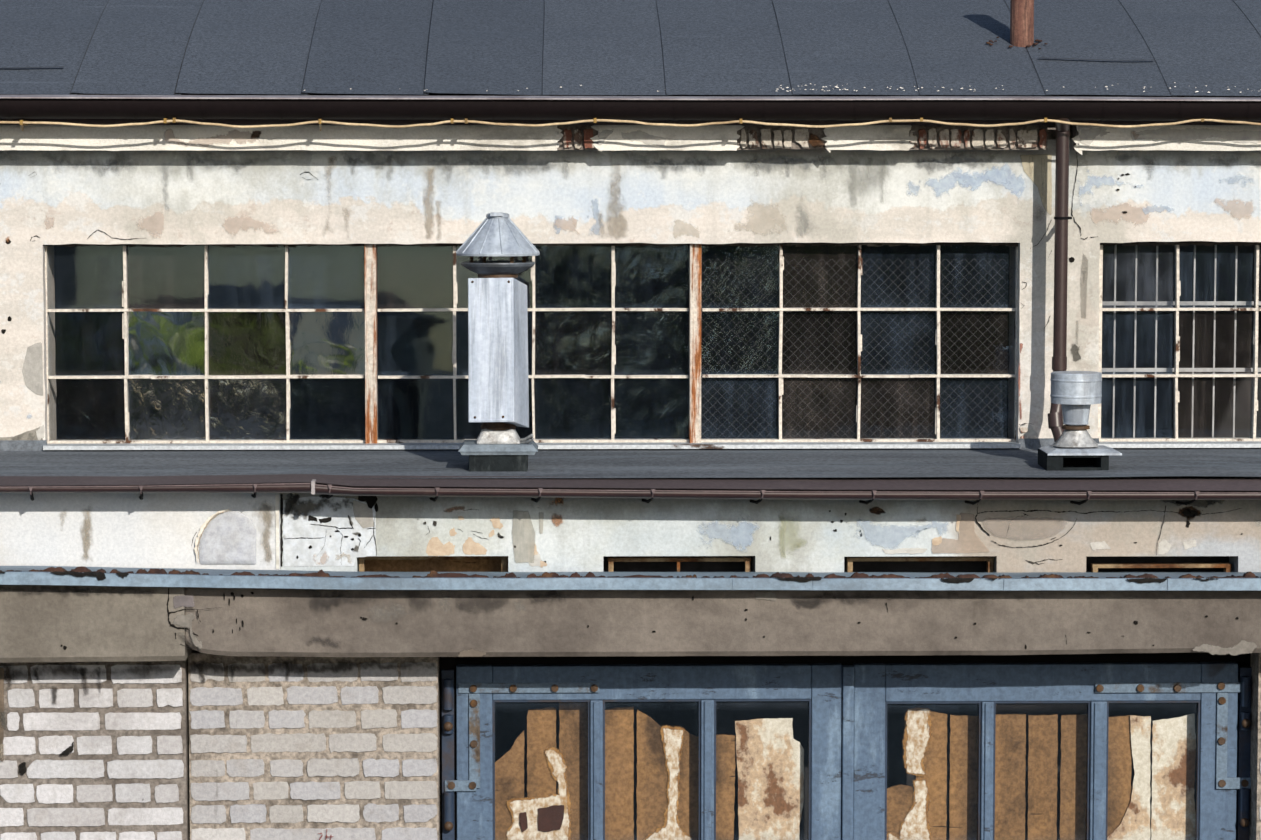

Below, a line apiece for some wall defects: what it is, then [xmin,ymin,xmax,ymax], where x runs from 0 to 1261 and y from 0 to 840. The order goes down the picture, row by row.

flaking render [740,128,809,149]
flaking render [910,128,1047,149]
water stain [191,158,256,167]
water stain [746,156,823,170]
water stain [918,153,981,169]
water stain [424,159,466,236]
water stain [1020,154,1052,215]
peeling [280,493,378,566]
peeling [426,516,516,556]
crack [975,504,1242,565]
rust [50,571,129,581]
crack [167,588,220,650]